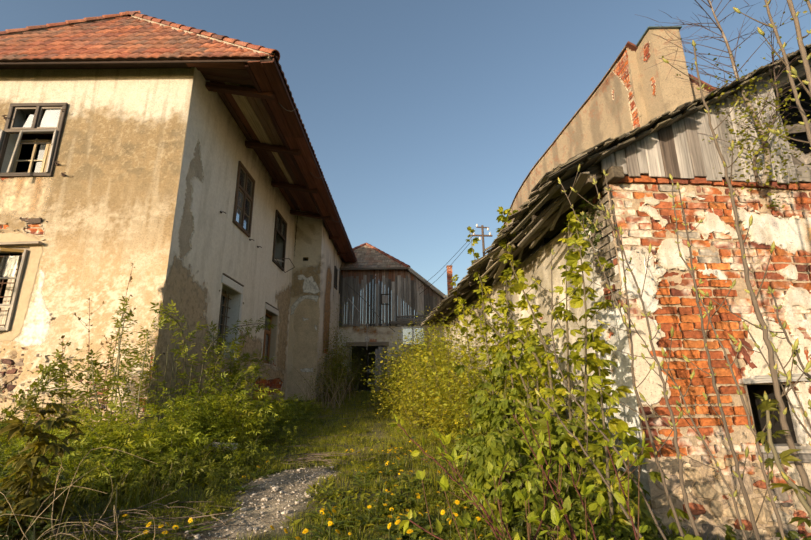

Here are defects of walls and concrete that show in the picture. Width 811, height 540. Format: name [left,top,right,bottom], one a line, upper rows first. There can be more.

water stain [0,177,49,216]
spalling [0,215,48,241]
peeling [135,138,285,426]
peeling [291,275,319,315]
spalling [582,175,811,487]